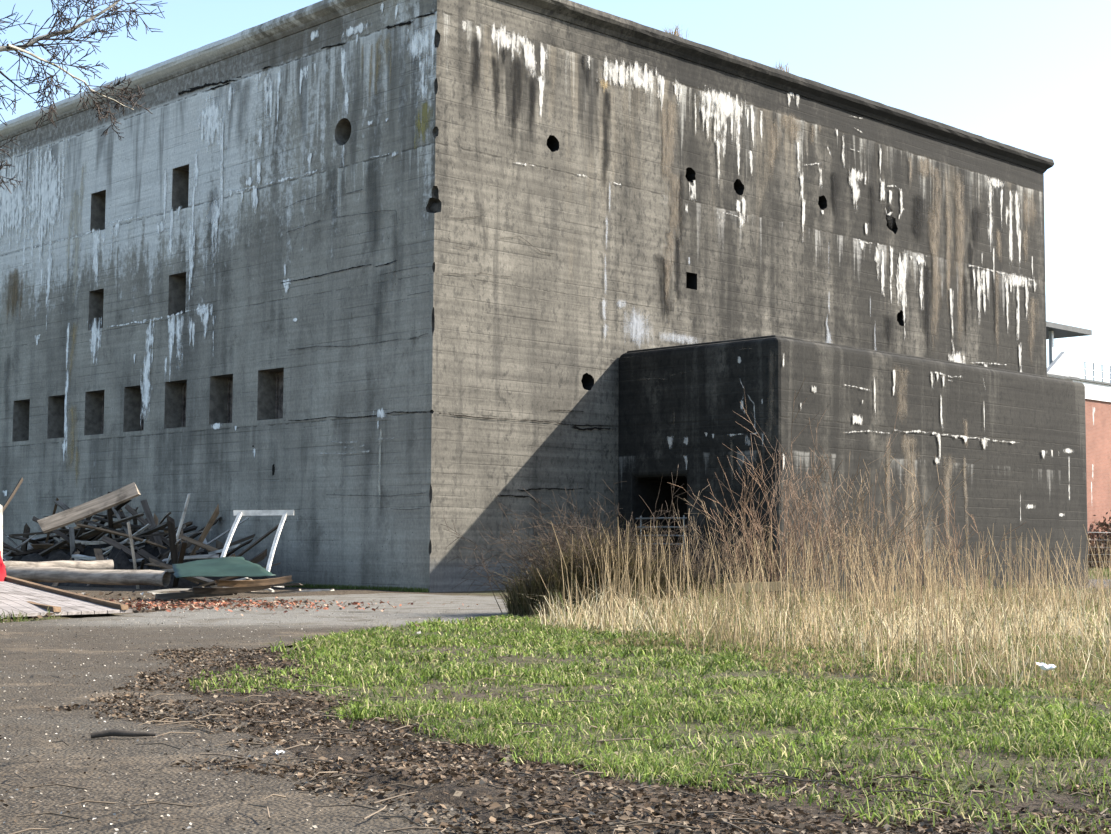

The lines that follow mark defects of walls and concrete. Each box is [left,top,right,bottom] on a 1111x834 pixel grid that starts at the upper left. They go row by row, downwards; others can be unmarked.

leakage [255,71,281,130]
leakage [299,63,316,94]
leakage [341,48,349,114]
leakage [463,21,545,126]
leakage [0,148,143,344]
leakage [87,85,293,424]
leakage [695,90,1036,543]